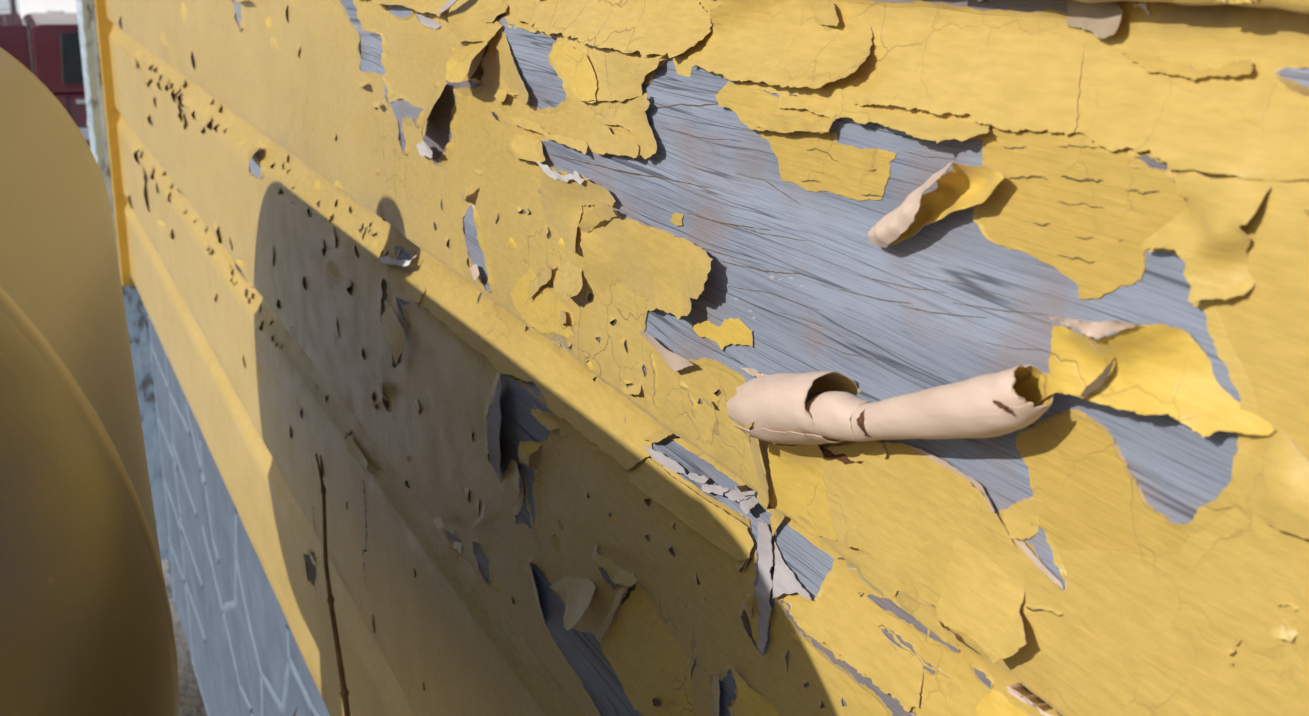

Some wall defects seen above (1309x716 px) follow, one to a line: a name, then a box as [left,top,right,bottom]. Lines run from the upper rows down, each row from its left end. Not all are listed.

crack [1215,0,1279,12]
peeling [131,52,227,134]
peeling [247,147,295,194]
peeling [125,146,283,349]
peeling [303,0,1309,716]
crack [347,434,371,585]